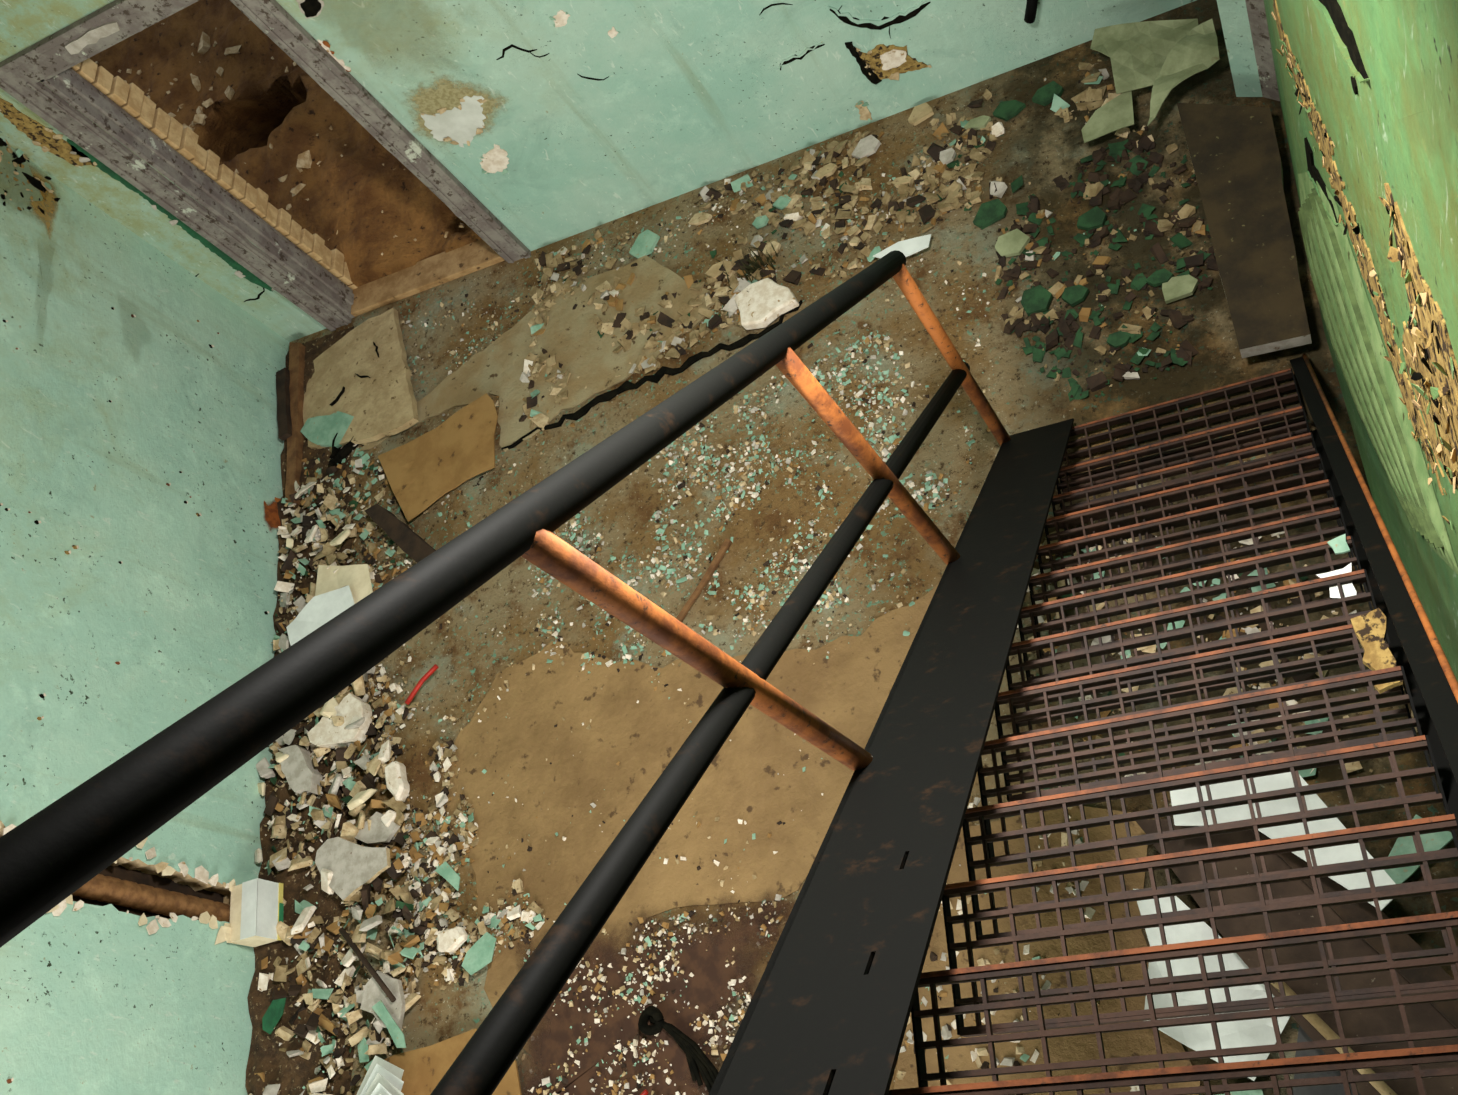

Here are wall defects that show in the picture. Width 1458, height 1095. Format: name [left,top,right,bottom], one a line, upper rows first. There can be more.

crack [496,44,549,60]
crack [759,0,931,70]
flaking render [845,42,932,85]
peeling [421,95,509,175]
peeling [0,98,274,291]
peeling [1271,0,1458,495]
flaking render [47,837,237,945]